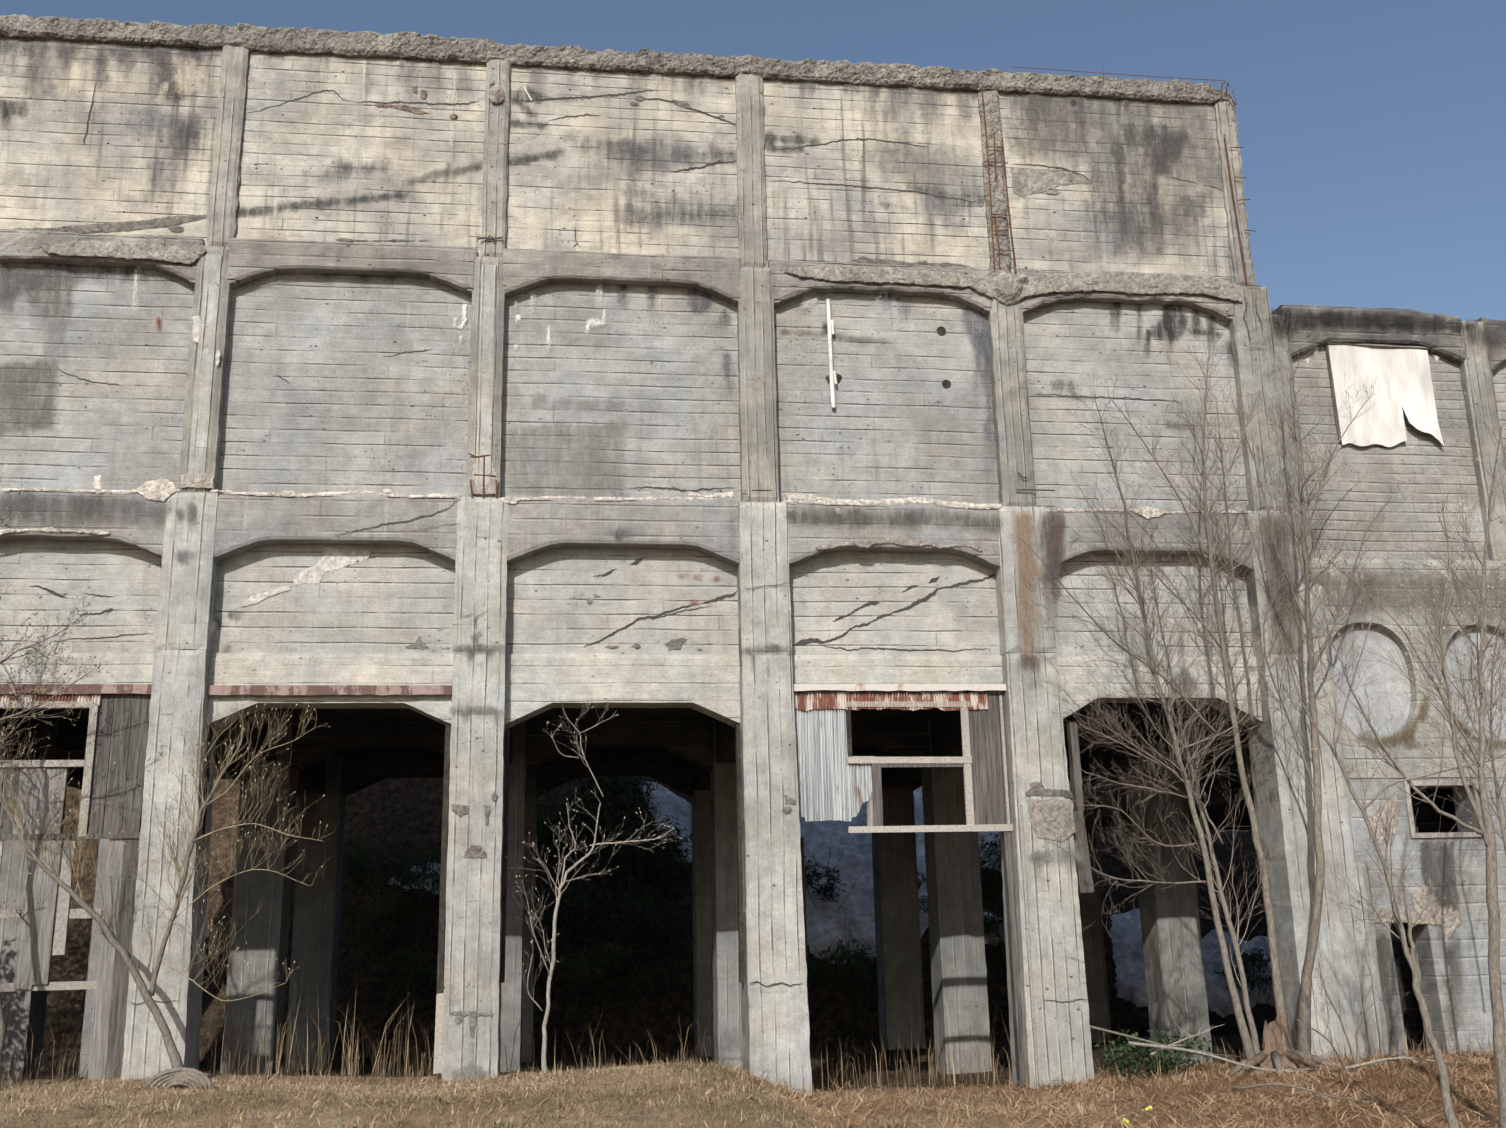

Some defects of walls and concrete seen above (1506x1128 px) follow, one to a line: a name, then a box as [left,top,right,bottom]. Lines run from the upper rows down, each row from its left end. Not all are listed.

damp [97,43,200,102]
crack [249,89,737,173]
crack [775,138,979,203]
spalling [783,90,1261,302]
damp [1014,93,1223,243]
damp [0,362,53,431]
spalling [1,453,735,504]
crack [584,583,790,647]
crack [793,574,995,652]
rust [1016,510,1064,667]
rust [794,692,989,711]
spalling [1025,782,1076,842]